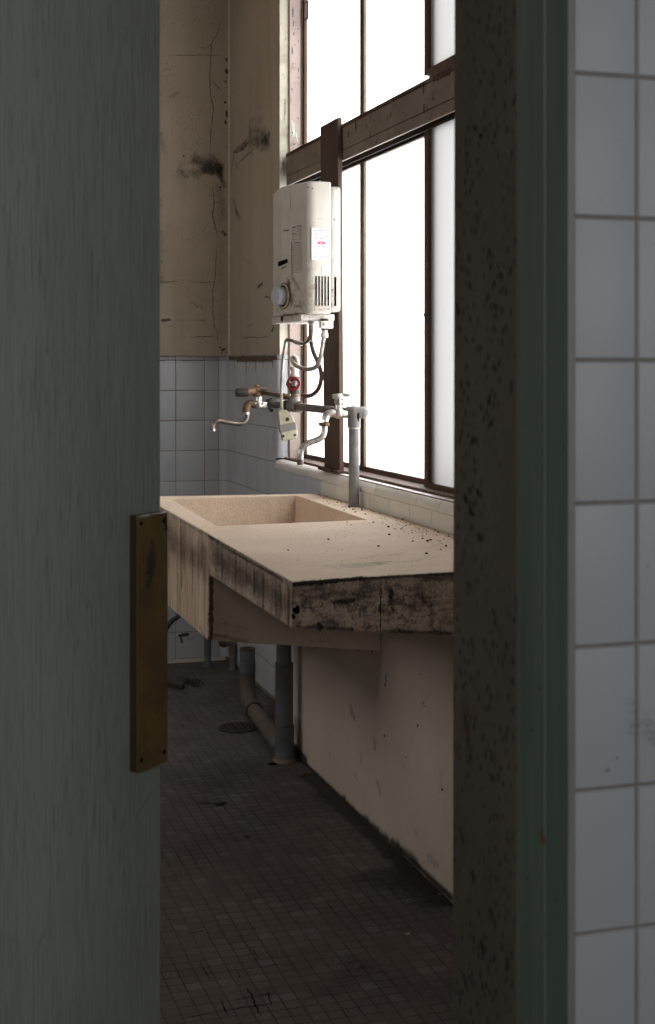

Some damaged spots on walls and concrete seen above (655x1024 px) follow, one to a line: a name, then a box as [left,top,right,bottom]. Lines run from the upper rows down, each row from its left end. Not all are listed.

crack [163,27,254,345]
damp [146,517,453,631]